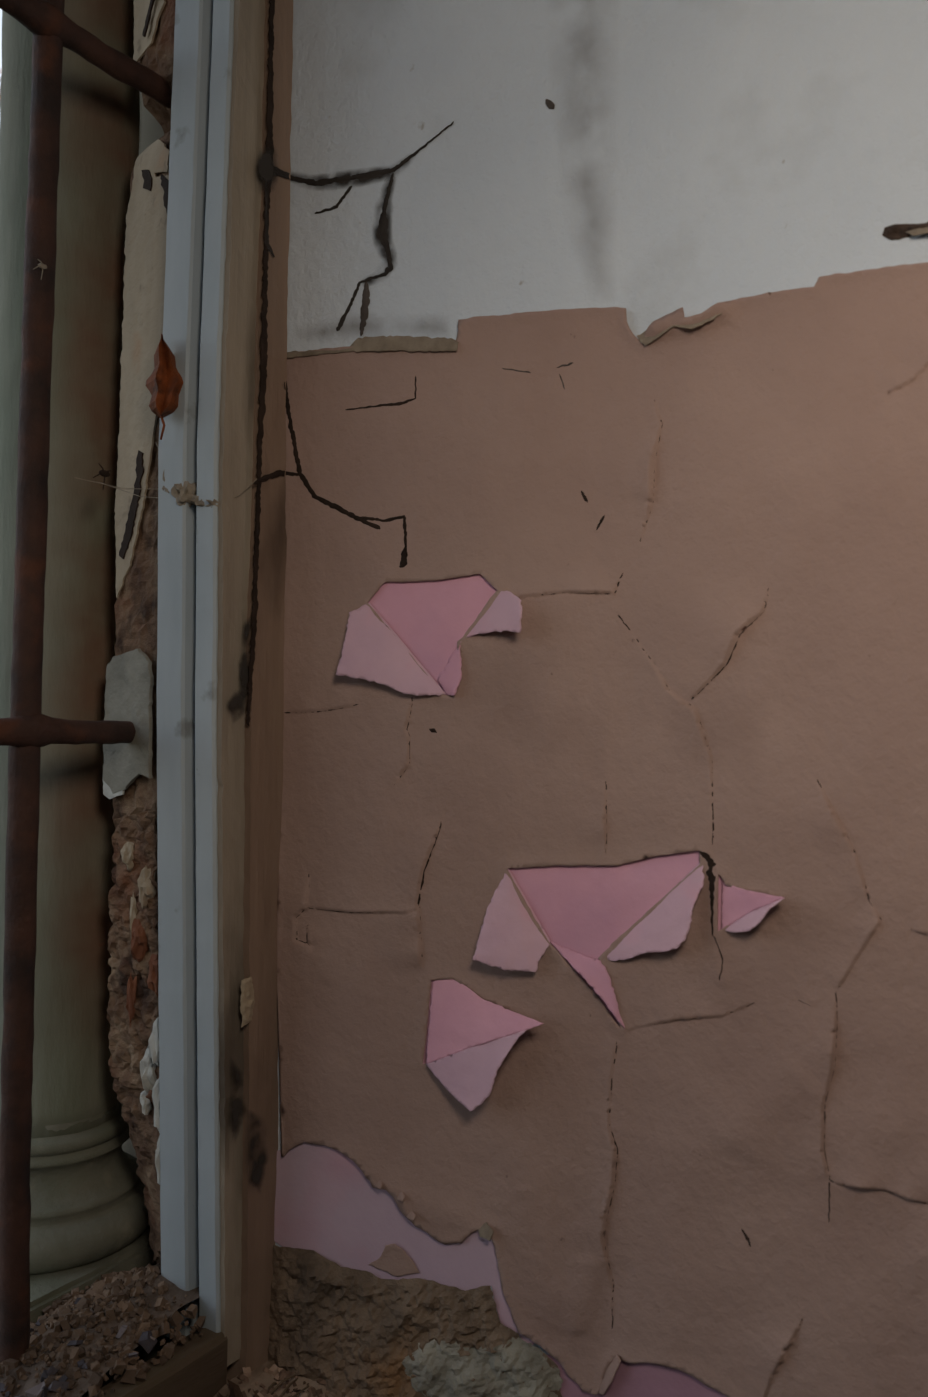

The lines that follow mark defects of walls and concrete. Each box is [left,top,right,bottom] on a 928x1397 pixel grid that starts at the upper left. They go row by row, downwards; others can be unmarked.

crack [264,121,454,331]
spalling [882,222,928,240]
crack [254,381,408,568]
crack [345,376,417,410]
peeling [103,781,125,799]
crack [542,573,769,845]
crack [417,823,442,956]
crack [799,986,845,1222]